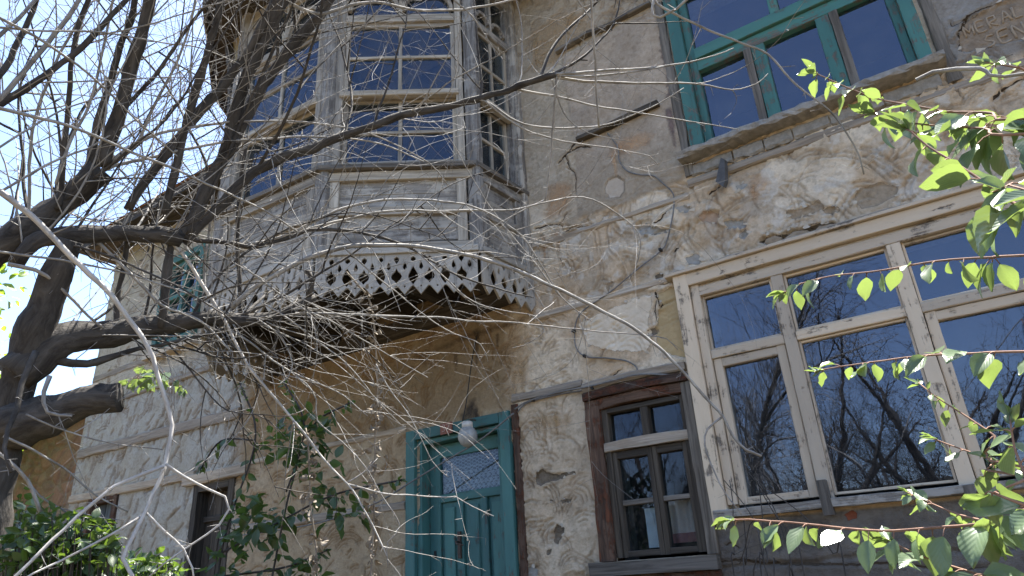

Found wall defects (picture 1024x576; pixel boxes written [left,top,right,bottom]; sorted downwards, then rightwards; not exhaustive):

crack [558,144,590,190]
peeling [676,182,901,245]
flaking render [533,469,576,486]
flaking render [547,523,565,555]